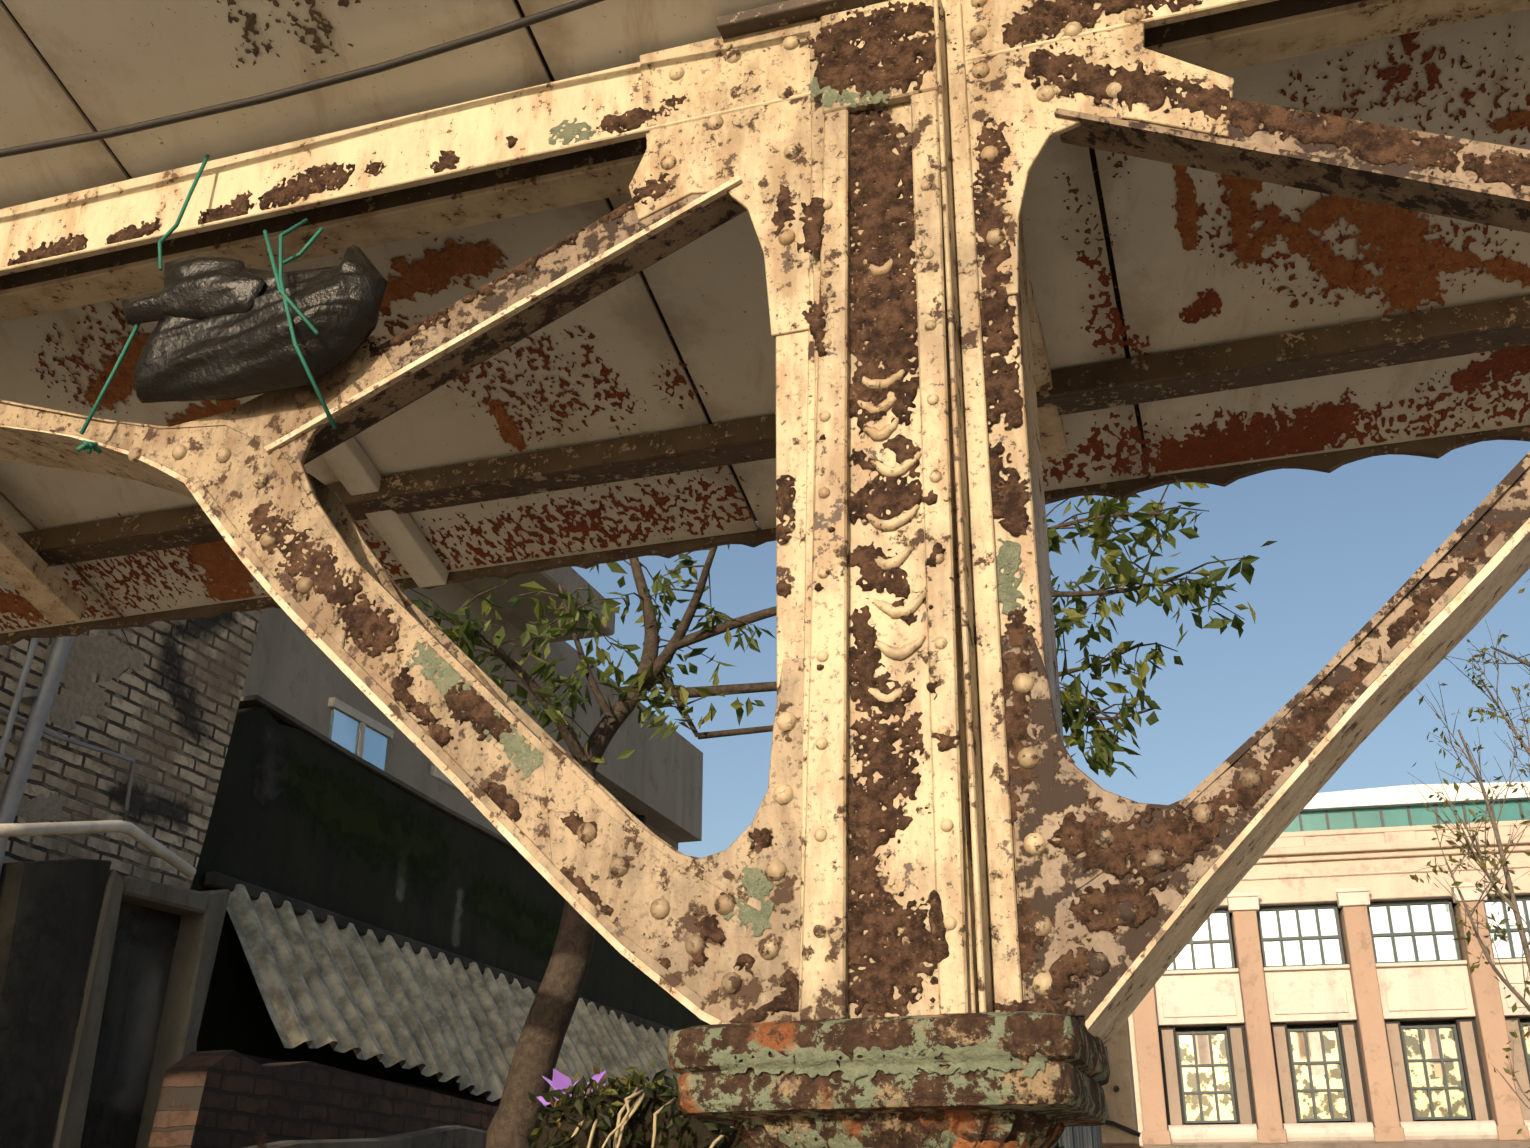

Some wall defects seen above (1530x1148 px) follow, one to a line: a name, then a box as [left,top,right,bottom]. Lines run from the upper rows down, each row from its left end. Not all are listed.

rust [1002,0,1530,192]
peeling [1269,25,1530,145]
rust [363,173,676,360]
peeling [1078,247,1151,360]
peeling [1172,164,1530,330]
peeling [1042,345,1530,486]
peeling [355,521,409,577]
peeling [941,1130,1029,1148]